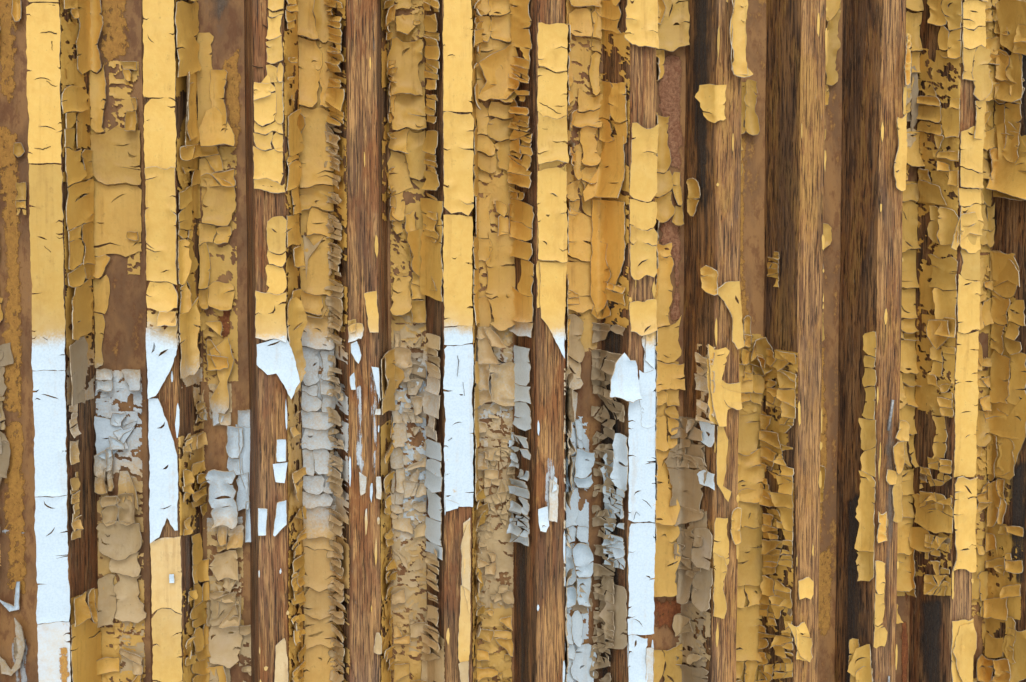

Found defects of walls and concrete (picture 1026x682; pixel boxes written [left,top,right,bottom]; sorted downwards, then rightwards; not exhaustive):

peeling [817,3,841,106]
rust [659,55,683,169]
rust [660,217,681,321]
peeling [822,223,832,250]
peeling [11,0,814,682]
peeling [855,0,1026,682]
peeling [0,342,14,484]
peeling [0,581,25,676]
peeling [848,638,873,682]